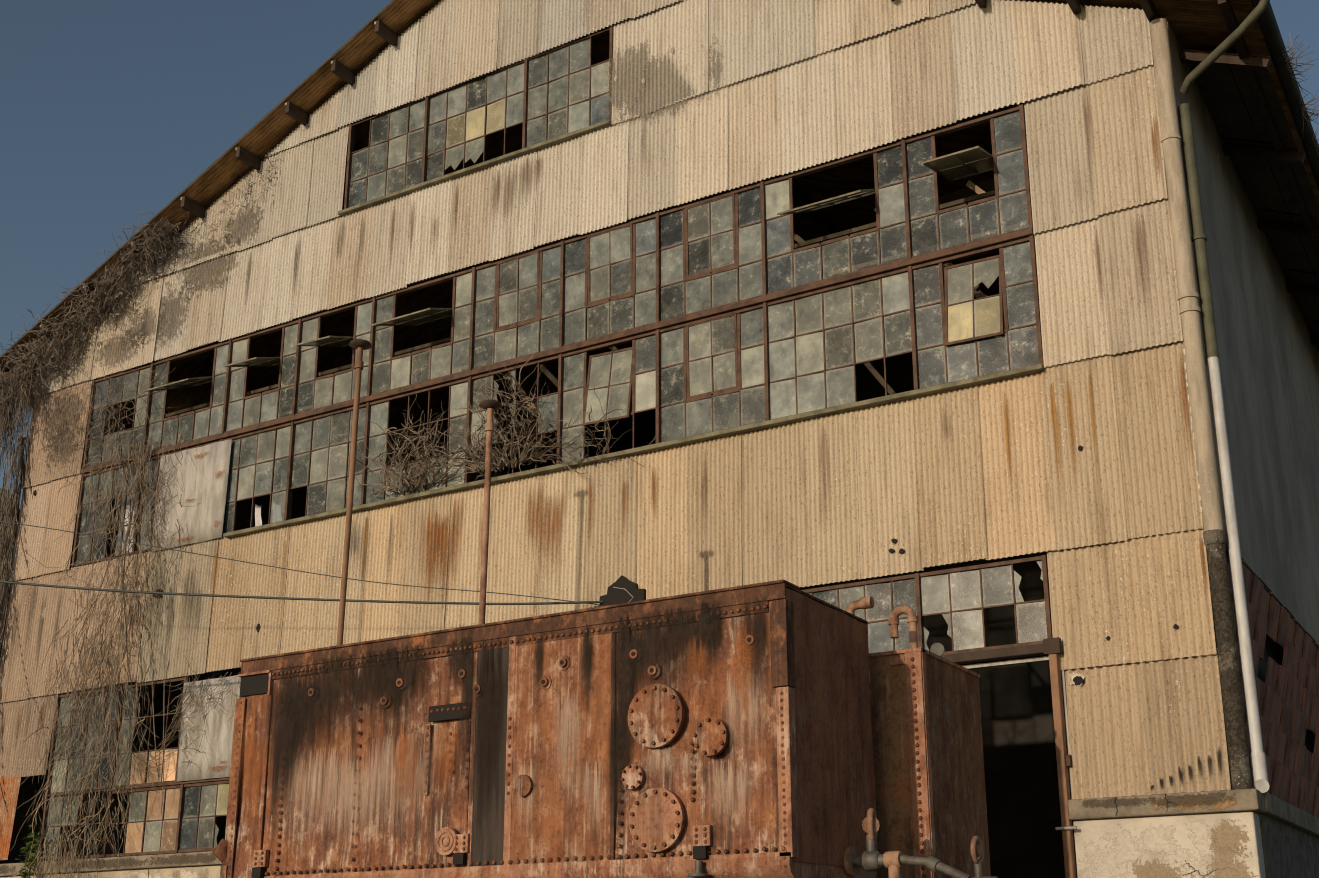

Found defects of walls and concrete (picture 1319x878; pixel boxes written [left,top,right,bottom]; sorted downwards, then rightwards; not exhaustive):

rust [425,501,457,583]
rust [528,486,562,557]
rust [0,775,21,860]
peeling [1079,794,1258,878]